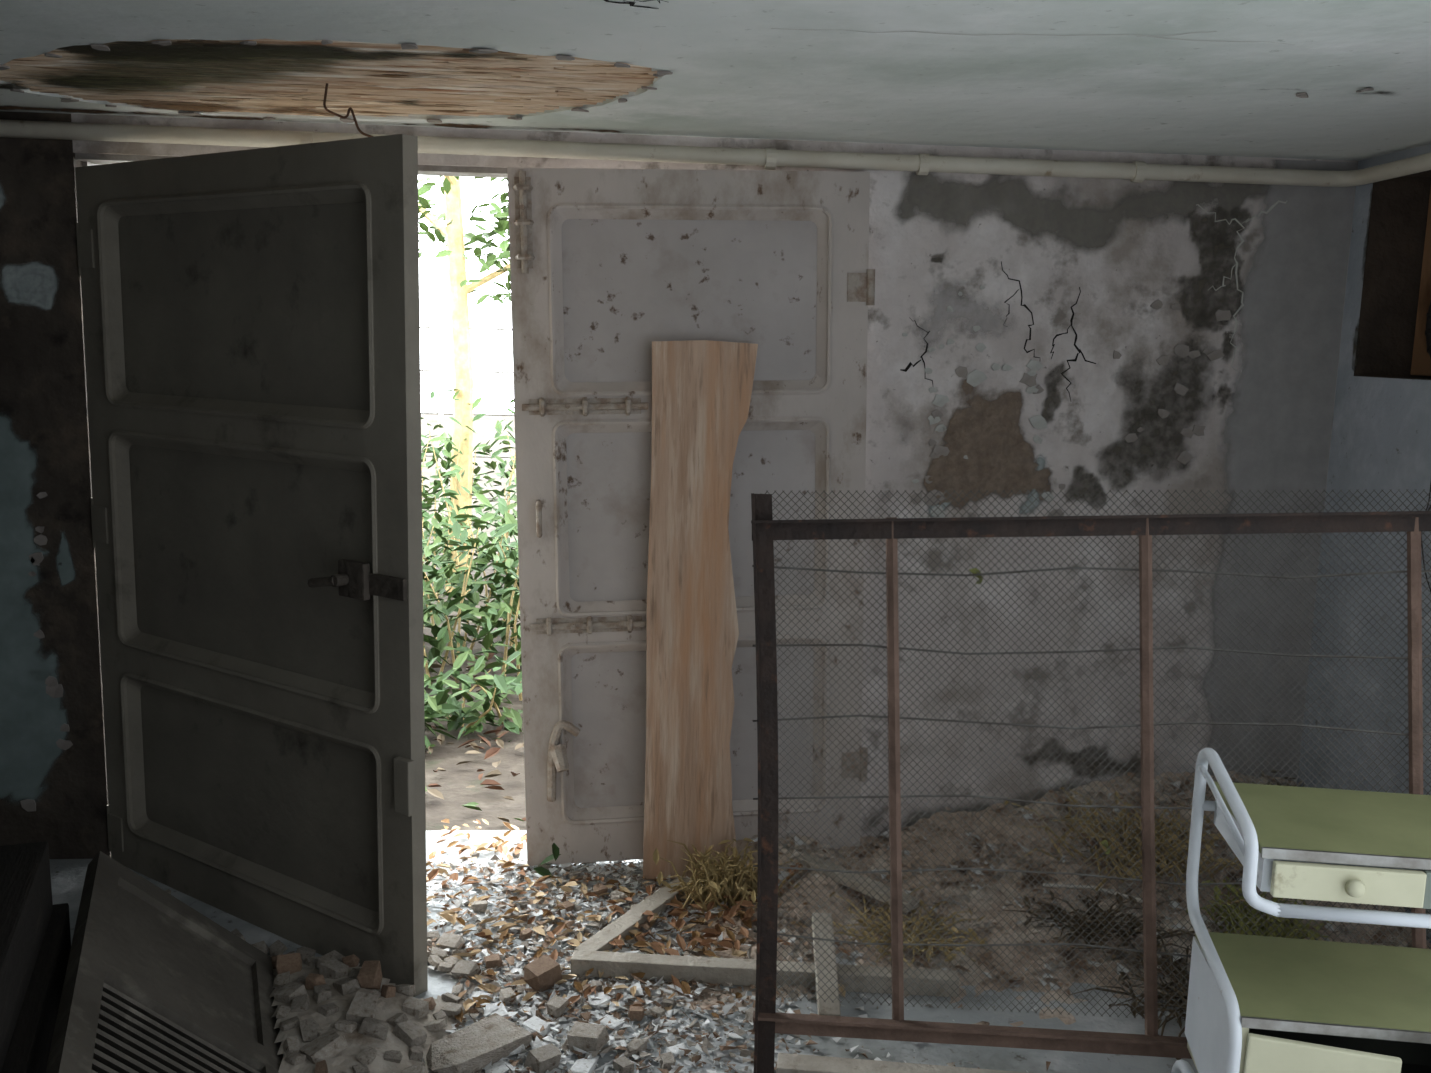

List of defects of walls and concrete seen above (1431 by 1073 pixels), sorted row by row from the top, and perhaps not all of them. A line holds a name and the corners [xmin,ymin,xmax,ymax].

flaking render [641,71,673,90]
flaking render [2,262,57,310]
crack [900,317,933,384]
crack [1001,261,1096,401]
leakage [897,172,1269,508]
flaking render [911,359,1065,518]
flaking render [0,416,75,812]